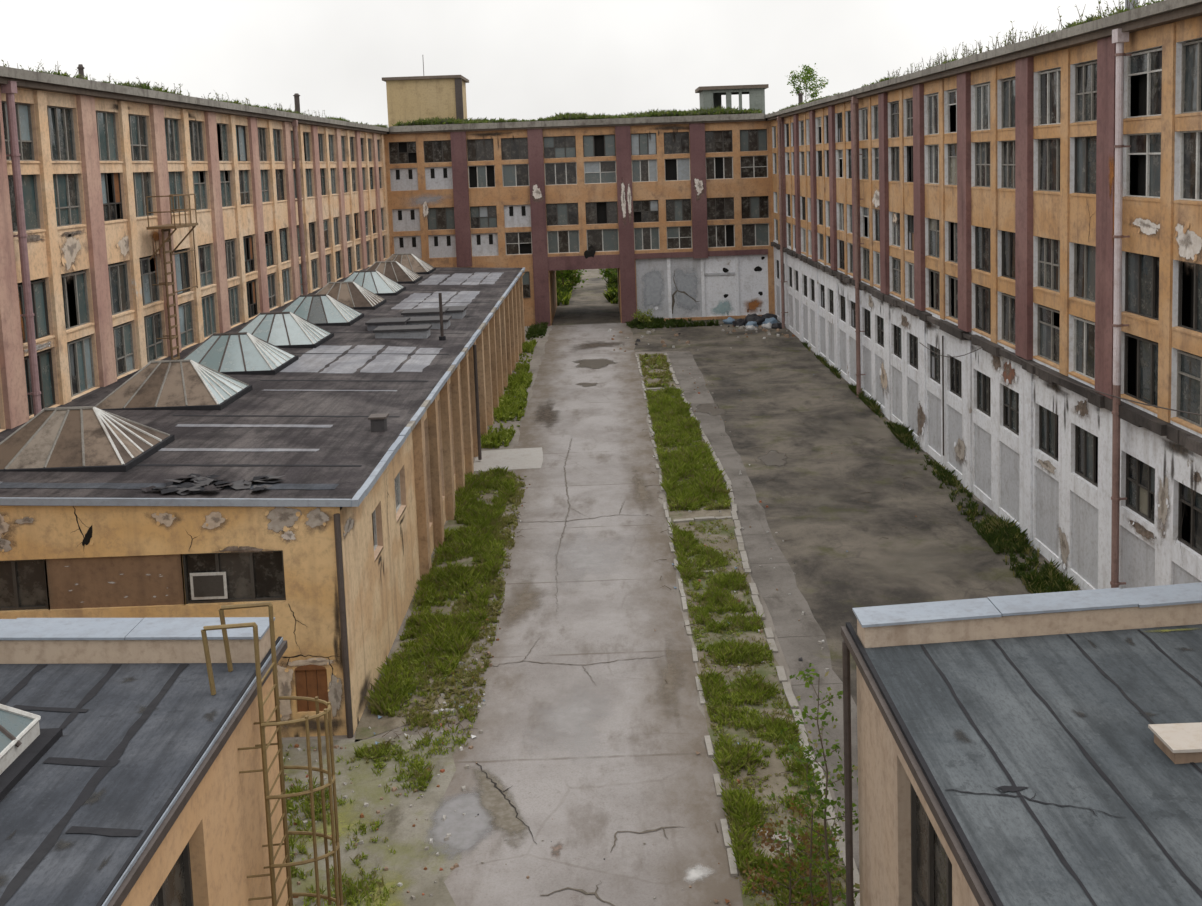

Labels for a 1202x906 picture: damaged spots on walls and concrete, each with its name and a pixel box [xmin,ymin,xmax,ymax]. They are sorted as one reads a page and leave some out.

peeling [621,184,631,220]
peeling [694,177,703,198]
peeling [61,230,82,271]
peeling [1131,218,1160,236]
peeling [1175,221,1202,262]
peeling [265,507,331,542]
crack [519,439,651,610]
crack [283,604,341,688]
crack [476,763,537,844]
crack [947,787,1118,817]
crack [610,826,681,853]
crack [540,881,615,906]